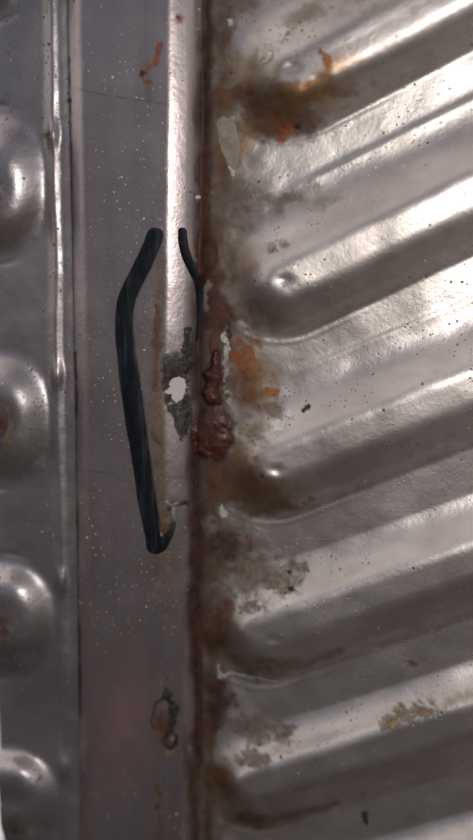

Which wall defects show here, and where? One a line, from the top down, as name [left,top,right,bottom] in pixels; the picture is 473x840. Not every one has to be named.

rust [140,42,162,83]
rust [193,0,347,414]
rust [158,444,238,840]